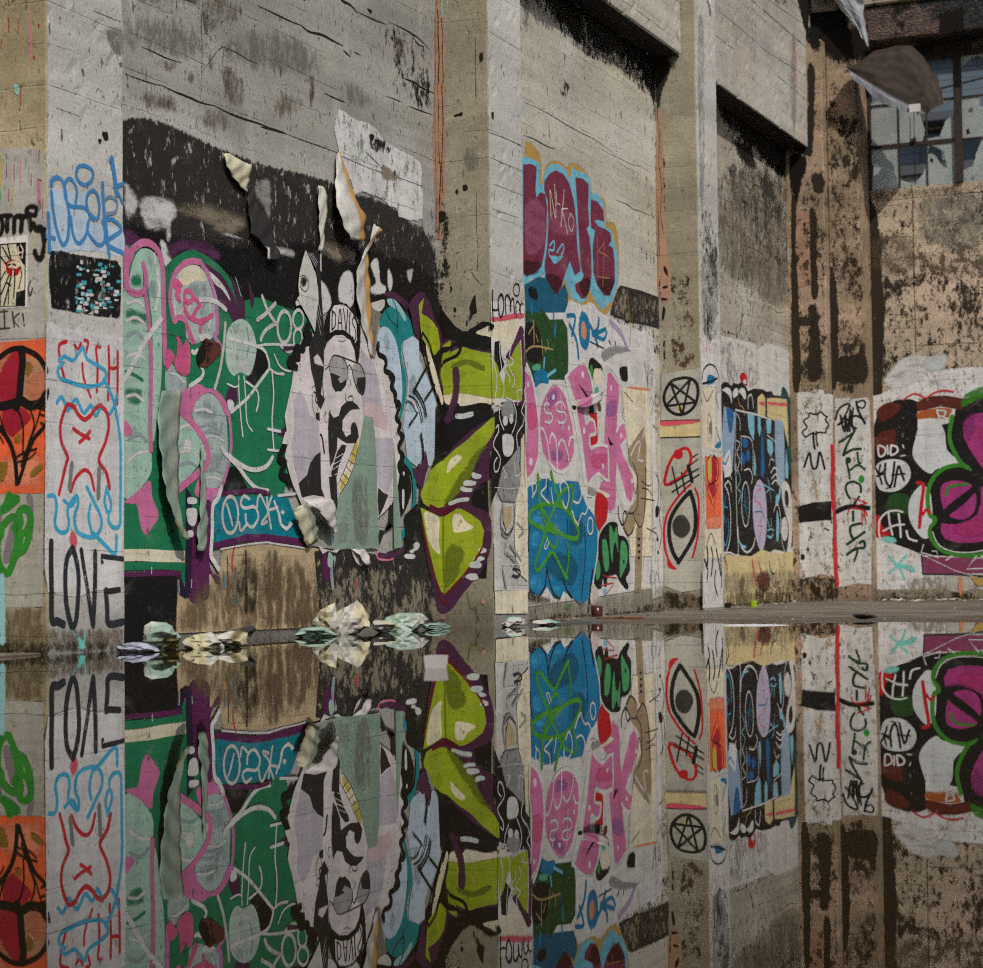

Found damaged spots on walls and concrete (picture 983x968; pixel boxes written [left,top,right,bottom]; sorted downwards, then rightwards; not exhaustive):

crack [259,6,361,57]
crack [341,0,430,50]
crack [126,0,335,152]
crack [386,77,434,115]